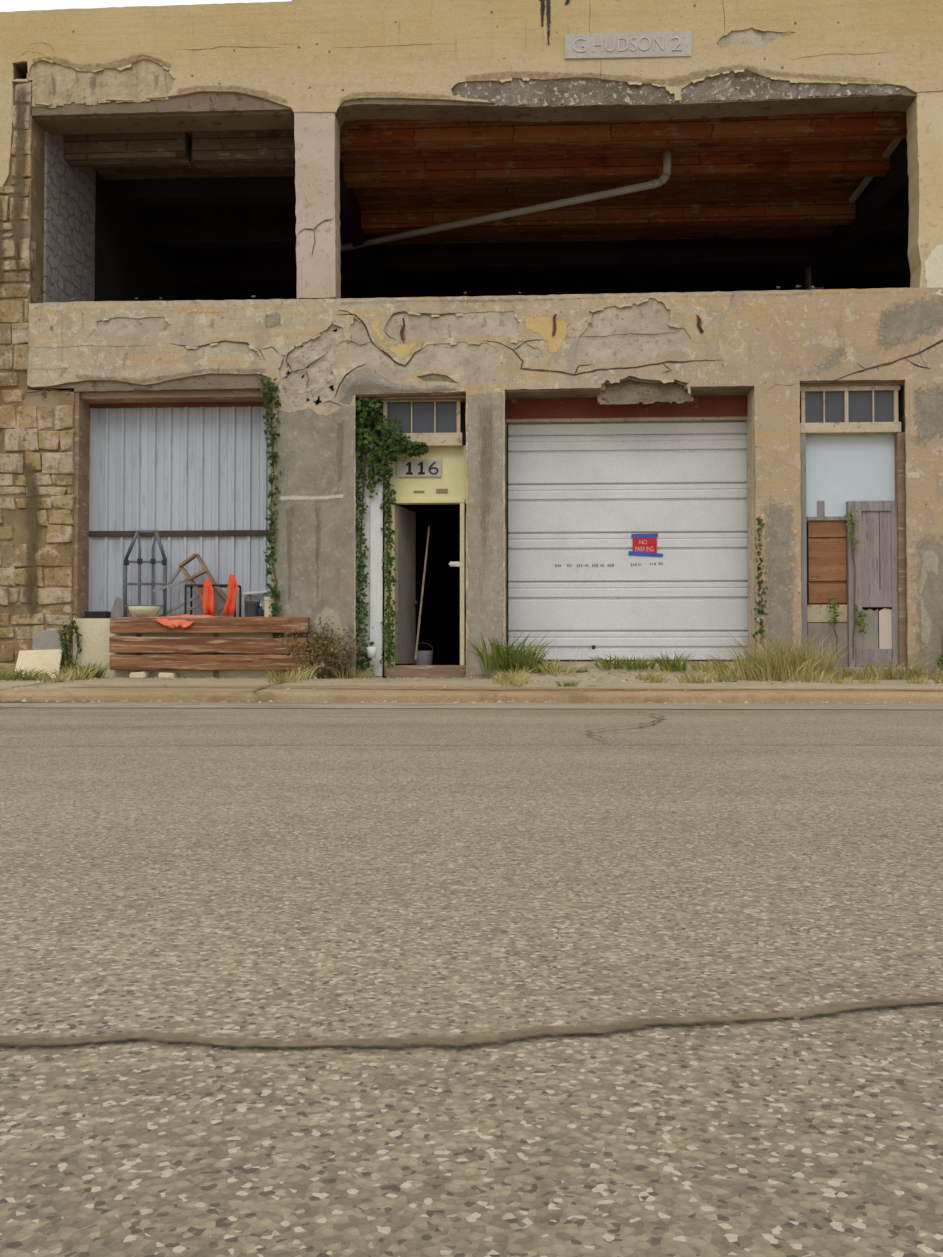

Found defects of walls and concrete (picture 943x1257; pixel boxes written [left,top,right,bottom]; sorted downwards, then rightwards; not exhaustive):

peeling [717,27,794,49]
peeling [25,57,176,108]
spalling [451,69,903,106]
peeling [183,341,263,359]
peeling [277,311,520,413]
peeling [574,297,691,364]
crack [832,337,943,381]
spalling [597,379,693,405]